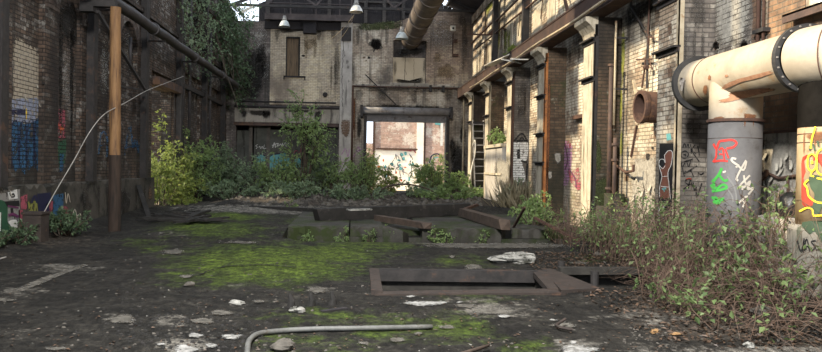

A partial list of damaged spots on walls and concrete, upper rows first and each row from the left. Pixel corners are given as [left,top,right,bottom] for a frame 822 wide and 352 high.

spalling [363,39,383,61]
rust [719,71,774,103]